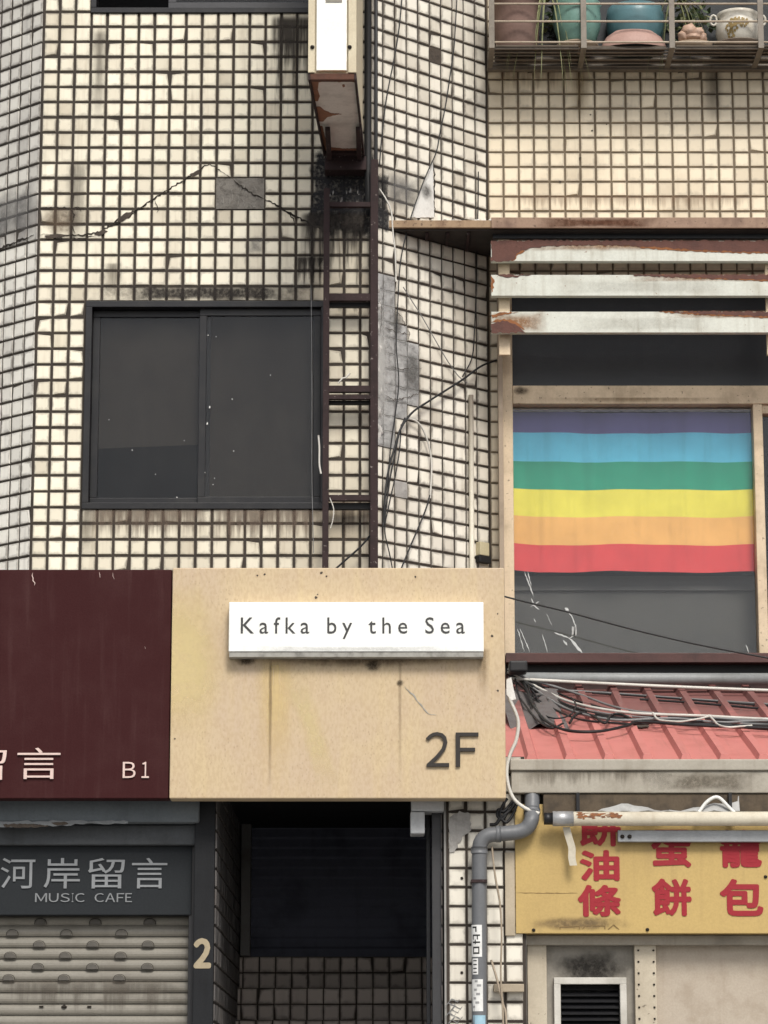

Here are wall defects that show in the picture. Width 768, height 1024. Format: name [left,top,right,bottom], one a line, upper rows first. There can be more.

rust [312,82,362,151]
crack [0,164,231,250]
peeling [216,178,264,209]
crack [265,199,319,228]
water stain [297,214,365,279]
rust [490,240,768,291]
rust [491,312,535,333]
rust [662,310,768,318]
peeling [378,273,421,448]
water stain [95,511,199,530]
water stain [219,511,312,534]